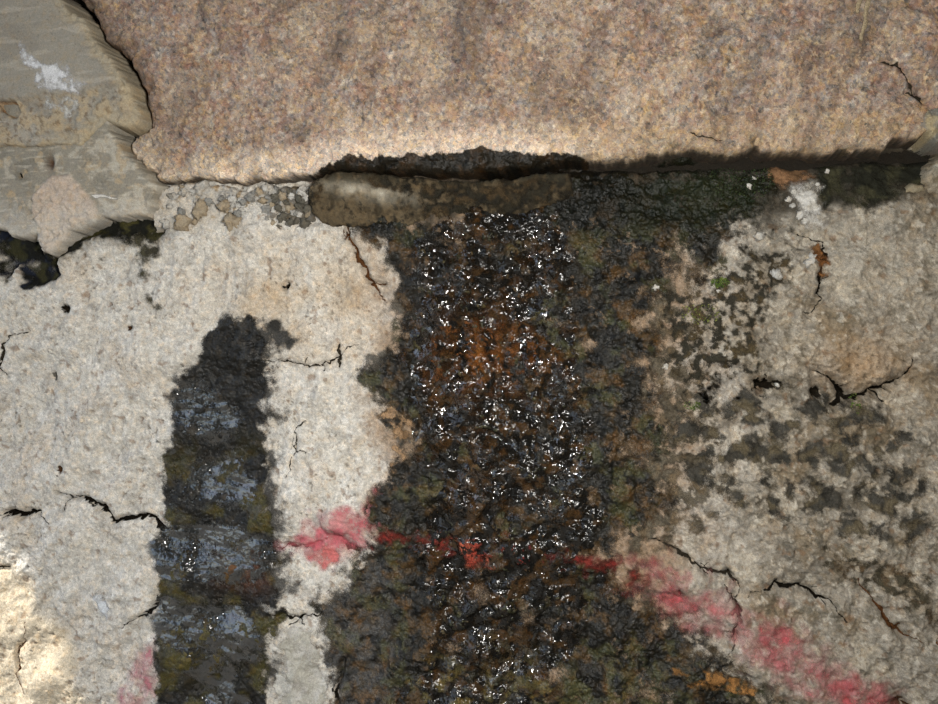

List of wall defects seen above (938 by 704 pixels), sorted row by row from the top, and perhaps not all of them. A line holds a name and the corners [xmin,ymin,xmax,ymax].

crack [343,227,386,301]
crack [0,332,28,375]
crack [265,344,352,371]
crack [812,359,913,406]
water stain [148,145,938,704]
crack [0,492,169,531]
crack [648,538,847,655]